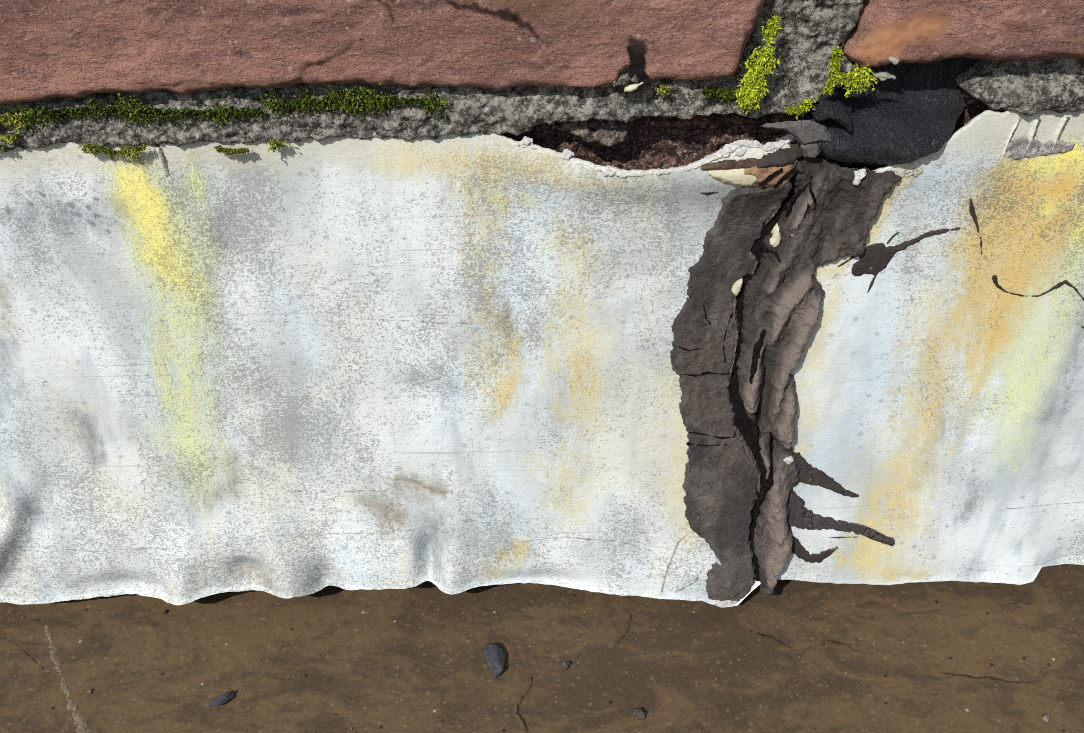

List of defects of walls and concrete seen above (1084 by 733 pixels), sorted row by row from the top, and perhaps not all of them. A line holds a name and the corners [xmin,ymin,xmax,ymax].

crack [448,0,534,33]
spalling [536,113,832,188]
peeling [853,169,867,186]
spalling [770,223,781,248]
spalling [731,279,743,296]